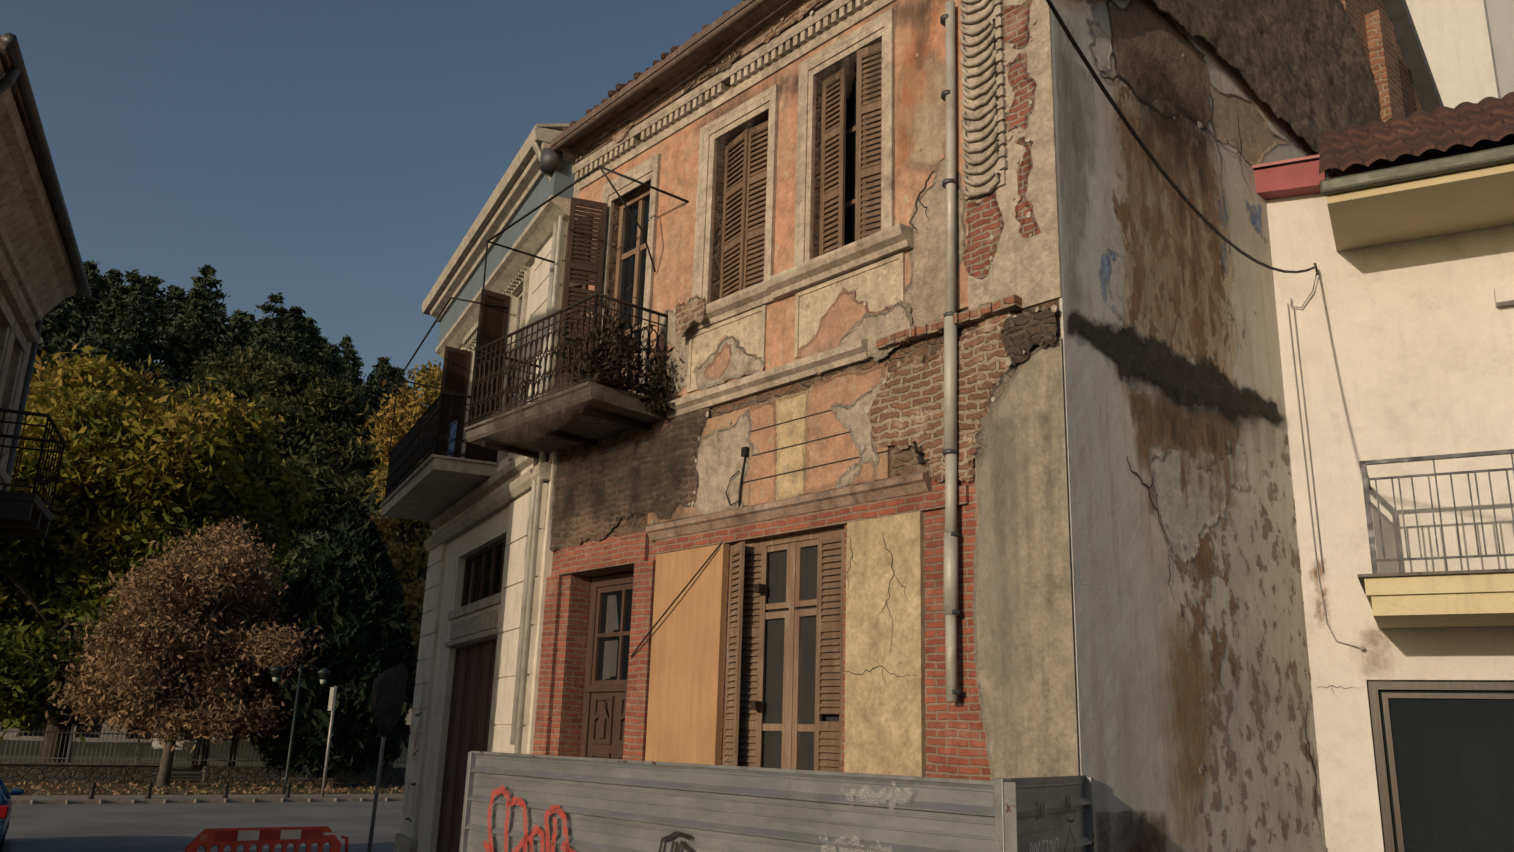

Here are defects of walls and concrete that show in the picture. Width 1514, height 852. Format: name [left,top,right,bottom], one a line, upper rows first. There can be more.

spalling [797,0,1058,488]
damp [1055,24,1081,246]
damp [1066,269,1284,426]
peeling [1086,0,1299,380]
crack [846,532,918,686]
crack [1127,456,1177,599]
peeling [1149,434,1328,852]